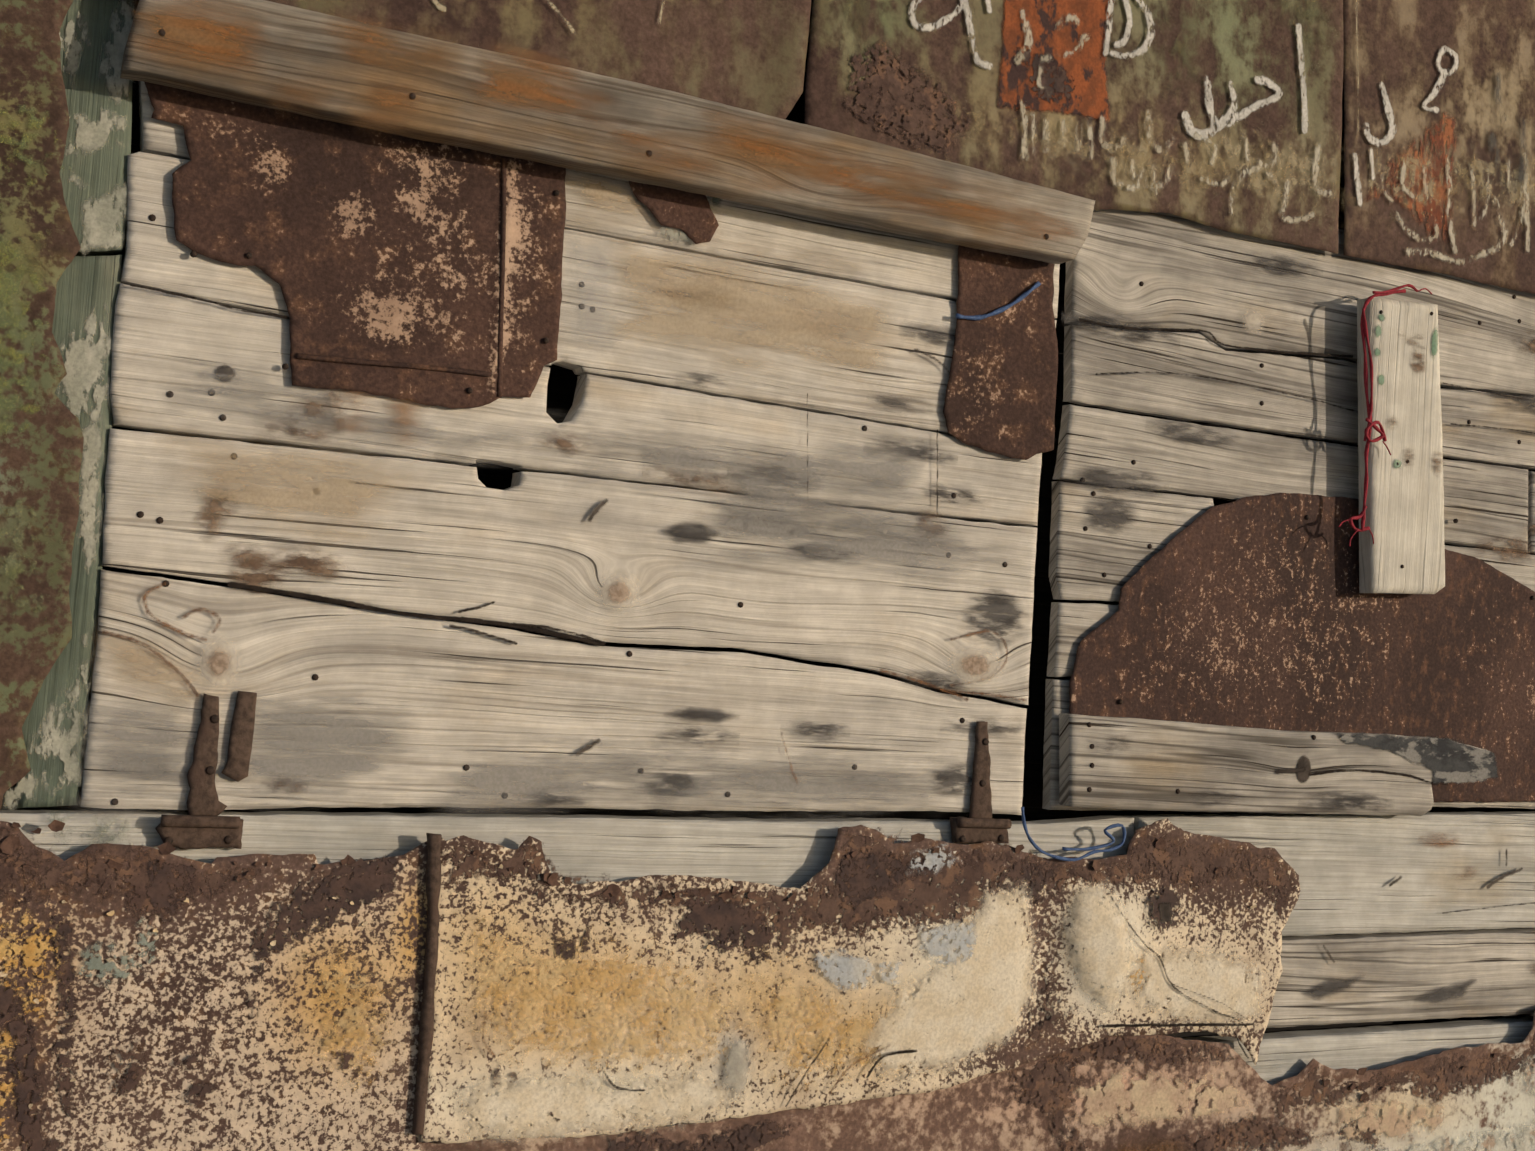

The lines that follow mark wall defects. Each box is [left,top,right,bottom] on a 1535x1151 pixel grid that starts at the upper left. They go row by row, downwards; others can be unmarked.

corrosion [150,14,252,61]
corrosion [845,41,970,160]
corrosion [997,0,1110,121]
corrosion [1367,112,1457,239]
crack [102,582,606,696]
crack [880,630,1027,701]
corrosion [0,819,272,1151]
corrosion [250,855,404,1019]
corrosion [444,827,1295,1151]
corrosion [334,1052,355,1070]
corrosion [1124,1033,1535,1151]